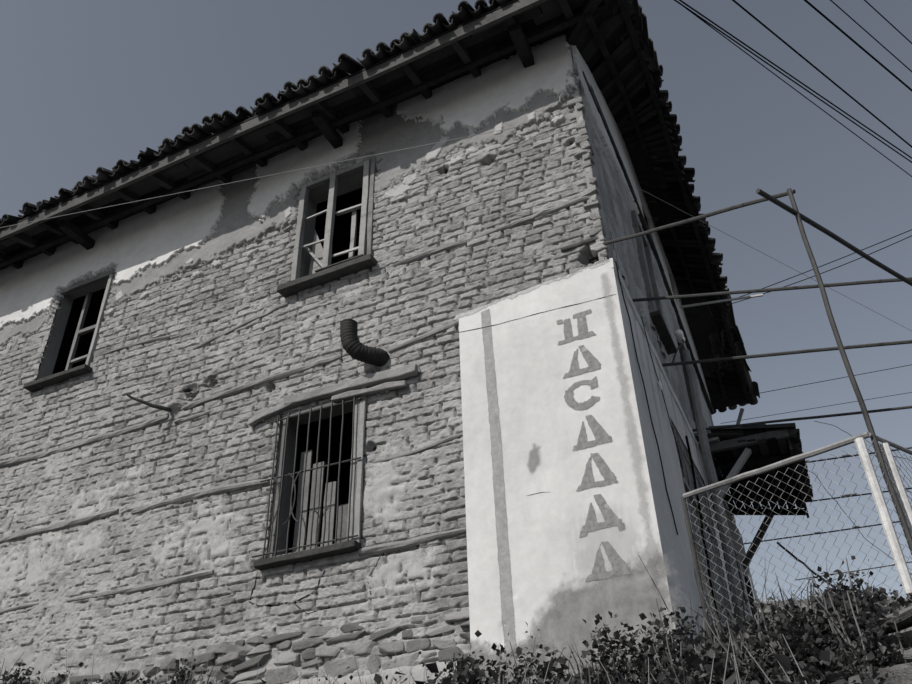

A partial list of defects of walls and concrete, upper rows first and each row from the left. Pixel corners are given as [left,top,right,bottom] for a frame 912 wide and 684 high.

peeling [246,120,364,223]
peeling [381,173,423,201]
peeling [396,34,686,357]
peeling [0,177,227,330]
spalling [183,379,218,401]
peeling [695,375,712,431]